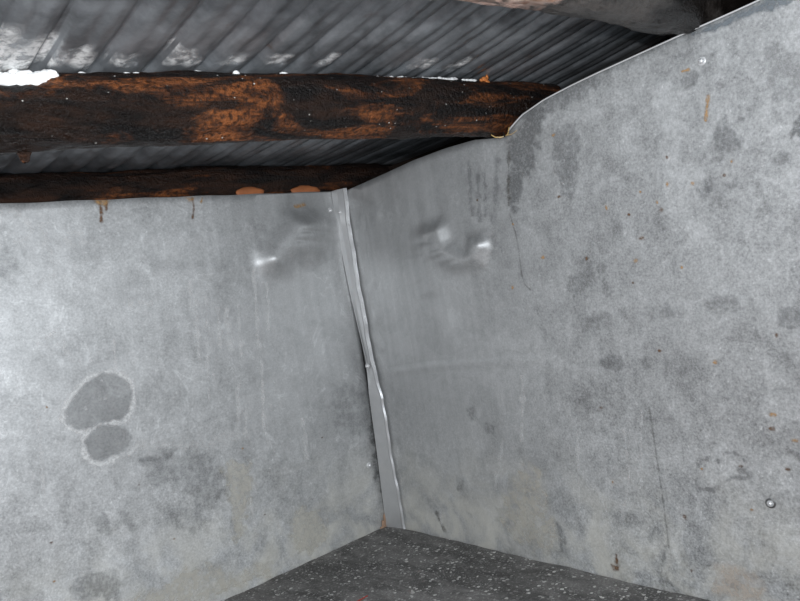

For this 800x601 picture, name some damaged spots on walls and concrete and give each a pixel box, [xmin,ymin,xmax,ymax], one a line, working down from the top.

damp [60,370,139,467]